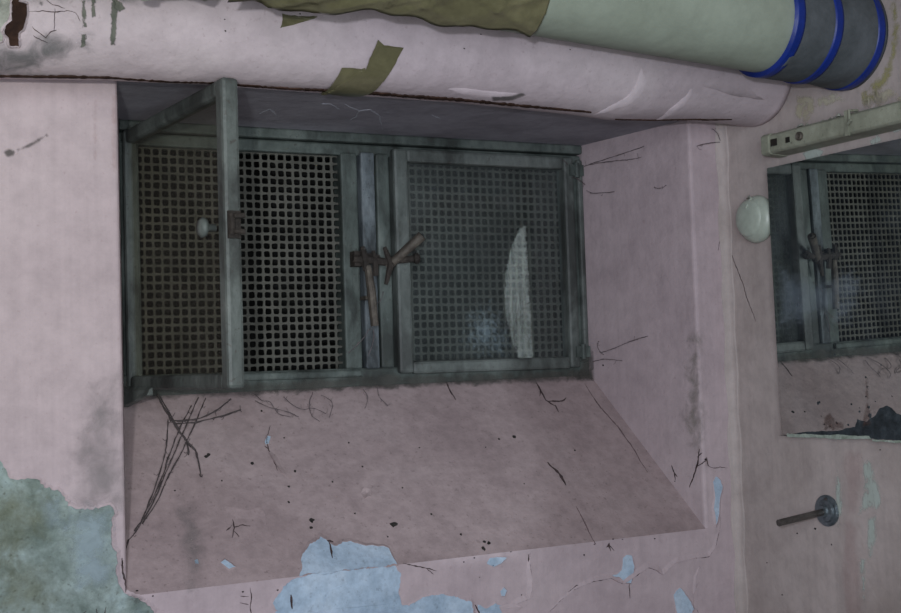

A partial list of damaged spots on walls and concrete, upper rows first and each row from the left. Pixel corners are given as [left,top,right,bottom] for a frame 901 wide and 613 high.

flaking render [0,0,30,48]
flaking render [0,459,159,613]
peeling [269,533,523,613]
peeling [607,554,636,584]
peeling [673,582,700,613]